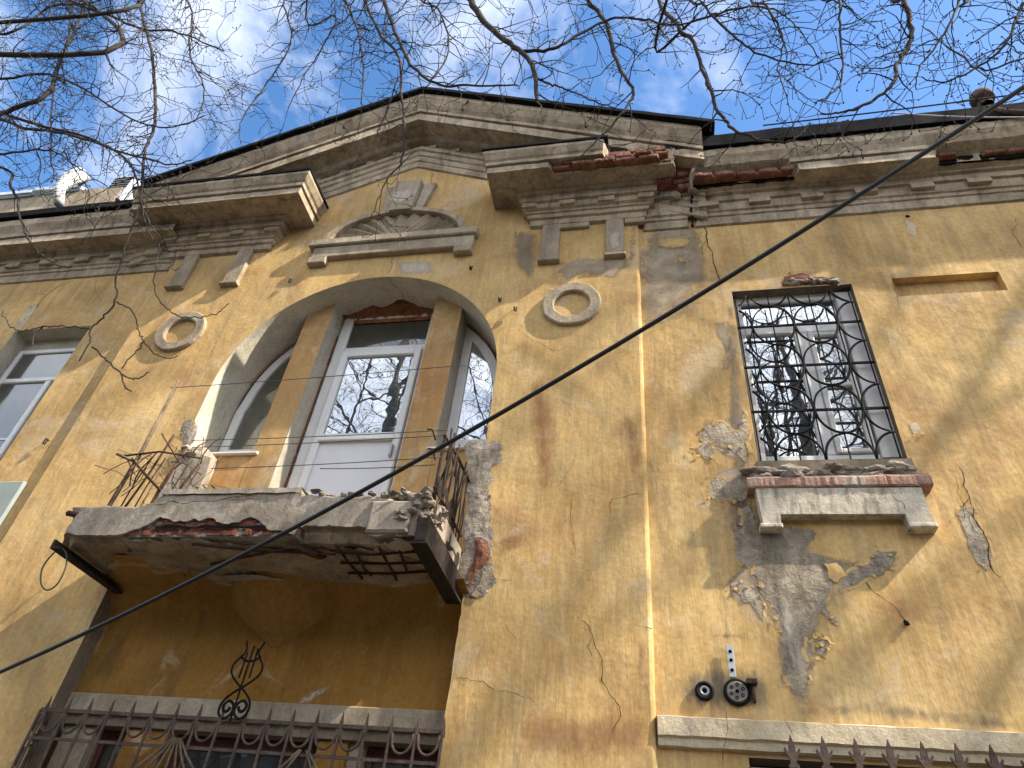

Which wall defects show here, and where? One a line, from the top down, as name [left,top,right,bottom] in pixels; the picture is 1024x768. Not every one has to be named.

flaking render [559,224,706,323]
crack [689,195,720,280]
spalling [121,518,433,588]
spalling [305,487,448,527]
flaking render [458,440,503,599]
flaking render [688,411,900,703]
crack [955,462,1006,587]
crack [578,617,621,742]